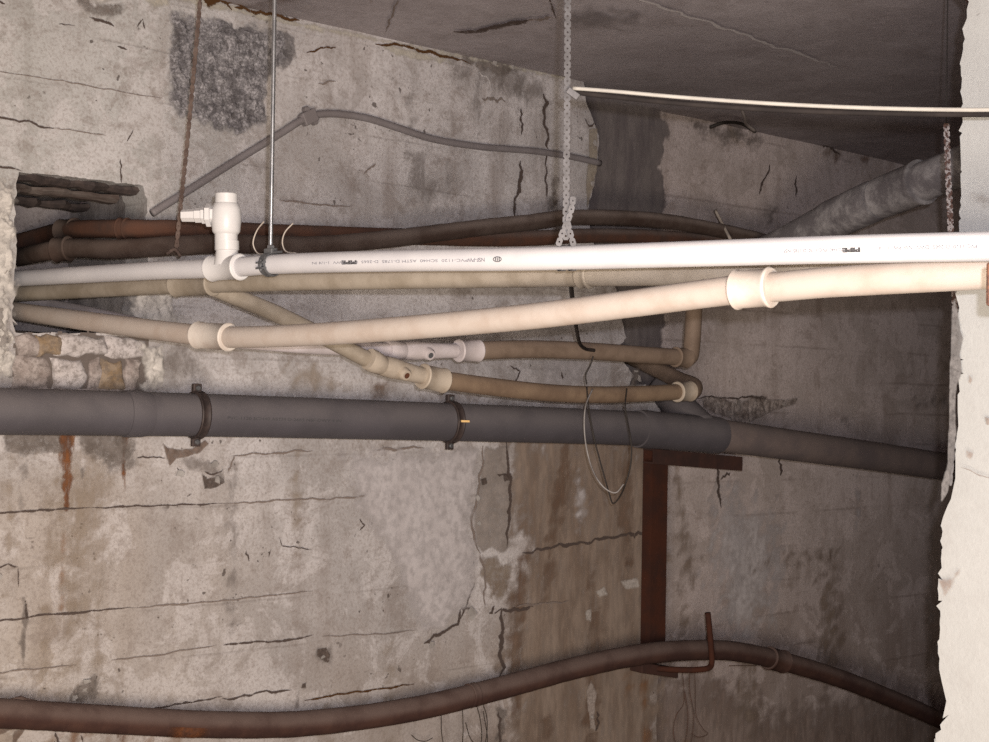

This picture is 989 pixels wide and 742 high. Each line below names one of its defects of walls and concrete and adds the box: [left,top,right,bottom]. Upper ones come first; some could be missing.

damp [183,0,565,80]
crack [375,1,470,64]
crack [0,117,133,183]
flaking render [0,178,149,391]
spalling [697,395,797,423]
corrosion [59,435,75,511]
crack [0,495,365,530]
peeling [470,446,512,604]
damp [495,442,643,674]
crack [0,591,309,622]
crack [111,582,567,676]
crack [155,684,413,708]